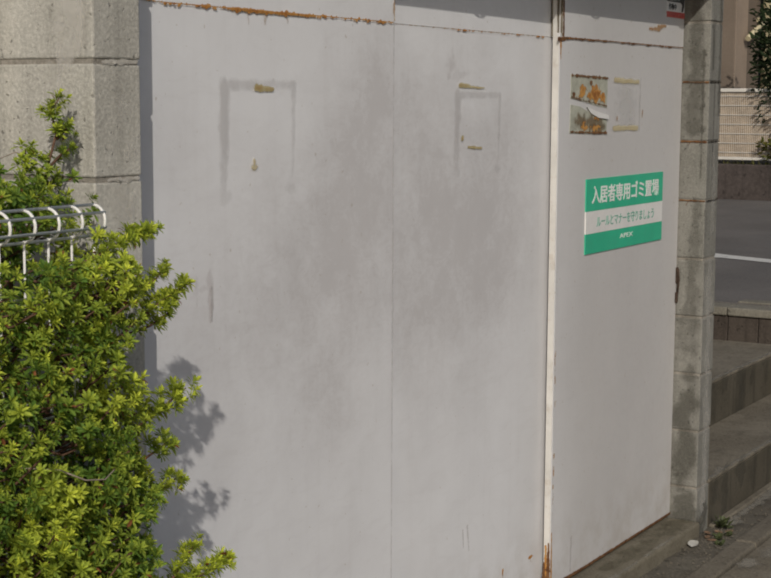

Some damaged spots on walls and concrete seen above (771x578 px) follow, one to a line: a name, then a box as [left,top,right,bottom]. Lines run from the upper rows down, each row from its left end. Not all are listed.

rust [148,0,395,24]
rust [558,0,684,54]
rust [542,533,552,578]
rust [564,512,670,578]